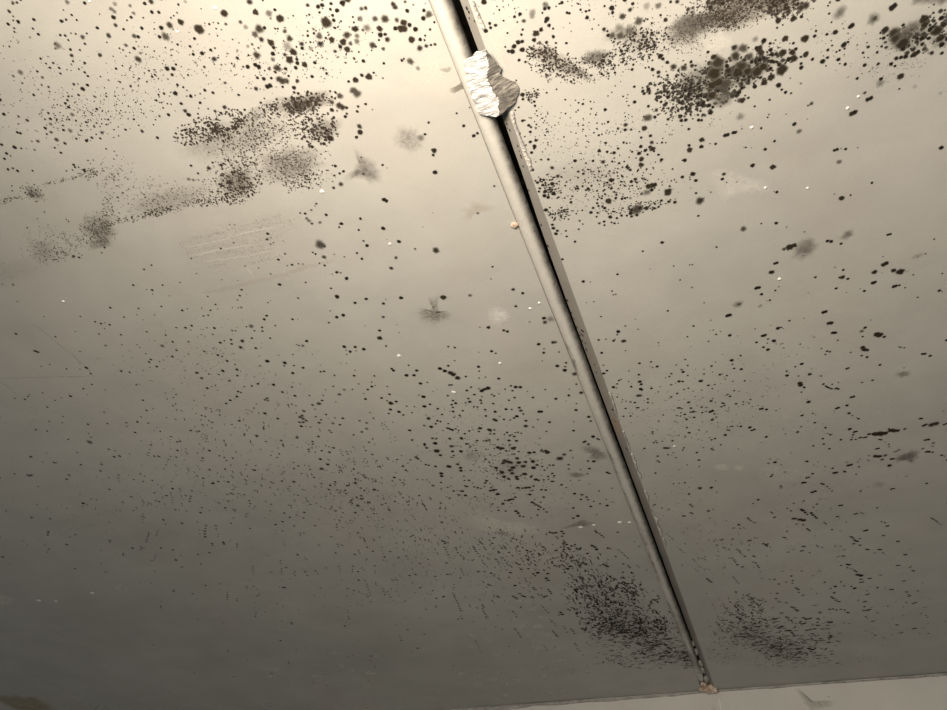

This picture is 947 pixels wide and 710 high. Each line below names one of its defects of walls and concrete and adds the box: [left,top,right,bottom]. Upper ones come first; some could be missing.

damp [0,0,436,266]
damp [312,217,369,280]
damp [82,295,693,669]
damp [611,354,780,565]
damp [695,516,931,666]
damp [755,320,947,553]